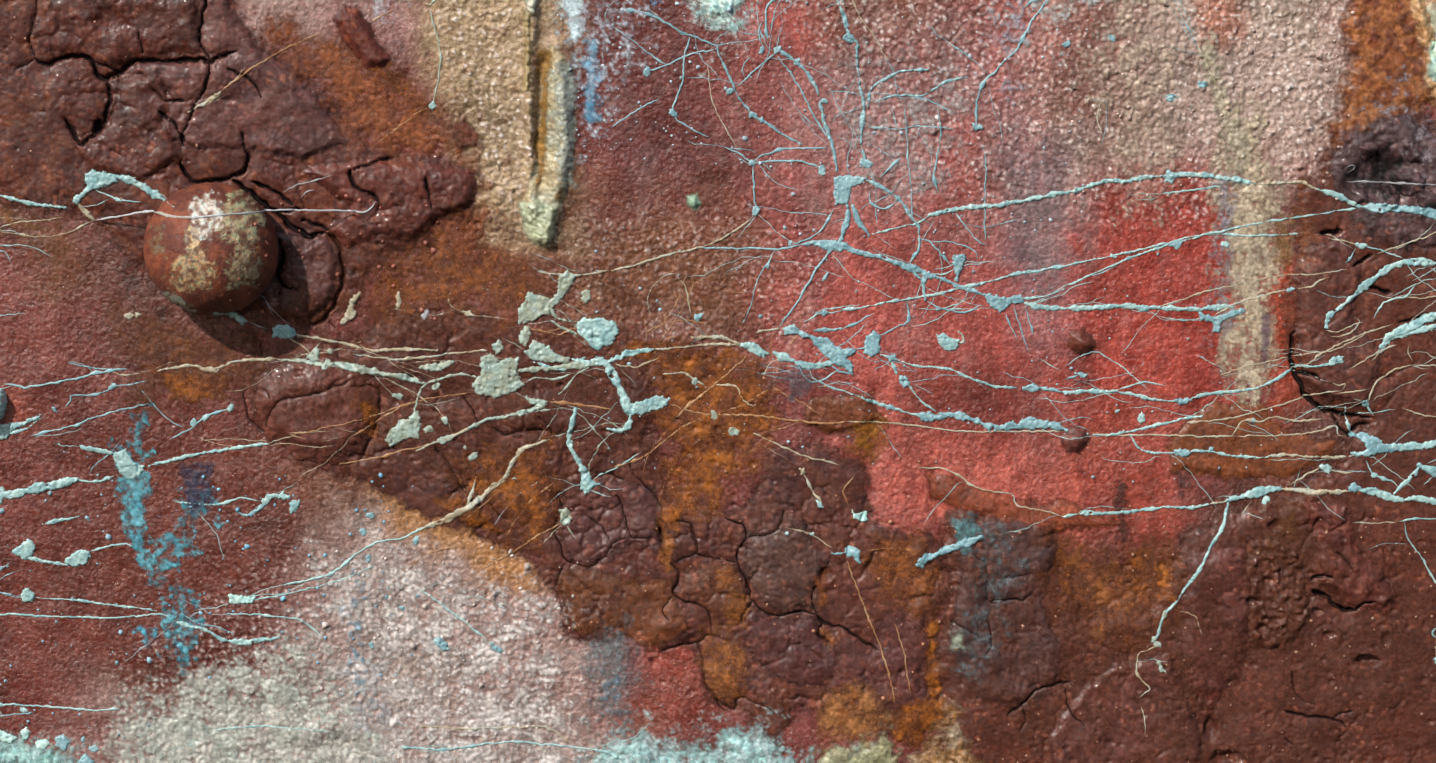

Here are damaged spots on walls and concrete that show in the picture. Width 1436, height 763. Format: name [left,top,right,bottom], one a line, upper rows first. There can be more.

crack [14,0,346,328]
leakage [554,0,604,184]
leakage [693,0,746,33]
leakage [1075,0,1287,405]
crack [243,342,386,460]
crack [461,395,553,436]
rust [352,319,782,572]
leakage [102,463,975,763]
crack [553,451,879,714]
rust [704,568,750,696]
rust [819,535,944,746]
leakage [0,737,85,763]